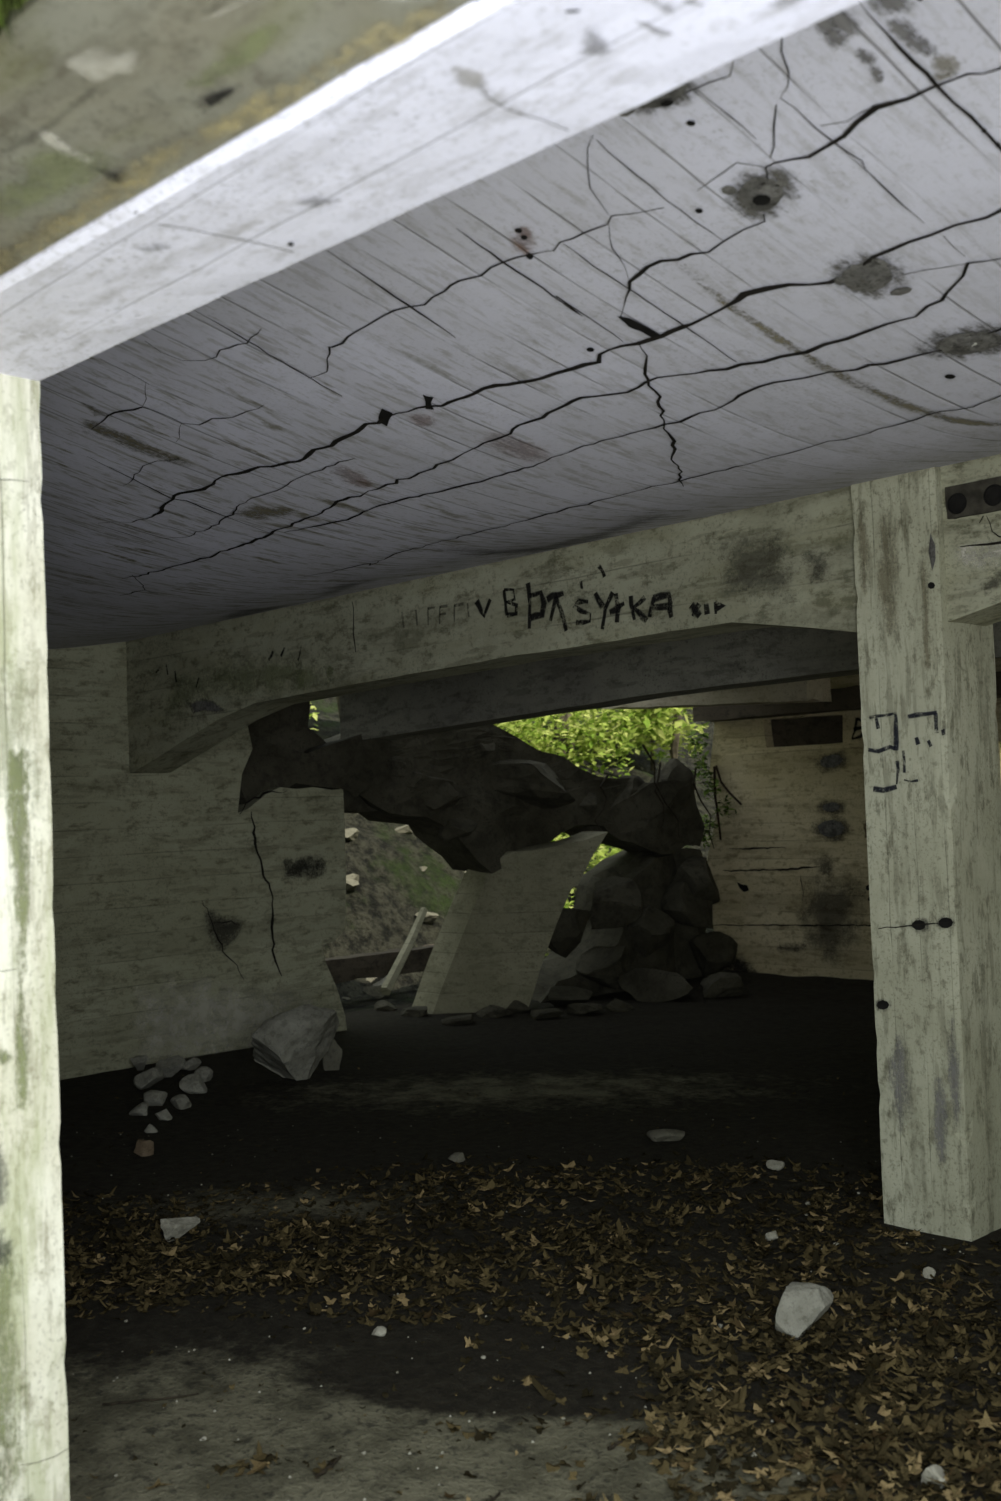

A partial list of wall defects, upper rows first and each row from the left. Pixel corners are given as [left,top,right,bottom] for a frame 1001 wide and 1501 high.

damp [815,11,883,83]
damp [870,0,958,81]
crack [87,2,1001,652]
damp [704,286,1001,426]
crack [202,791,284,979]